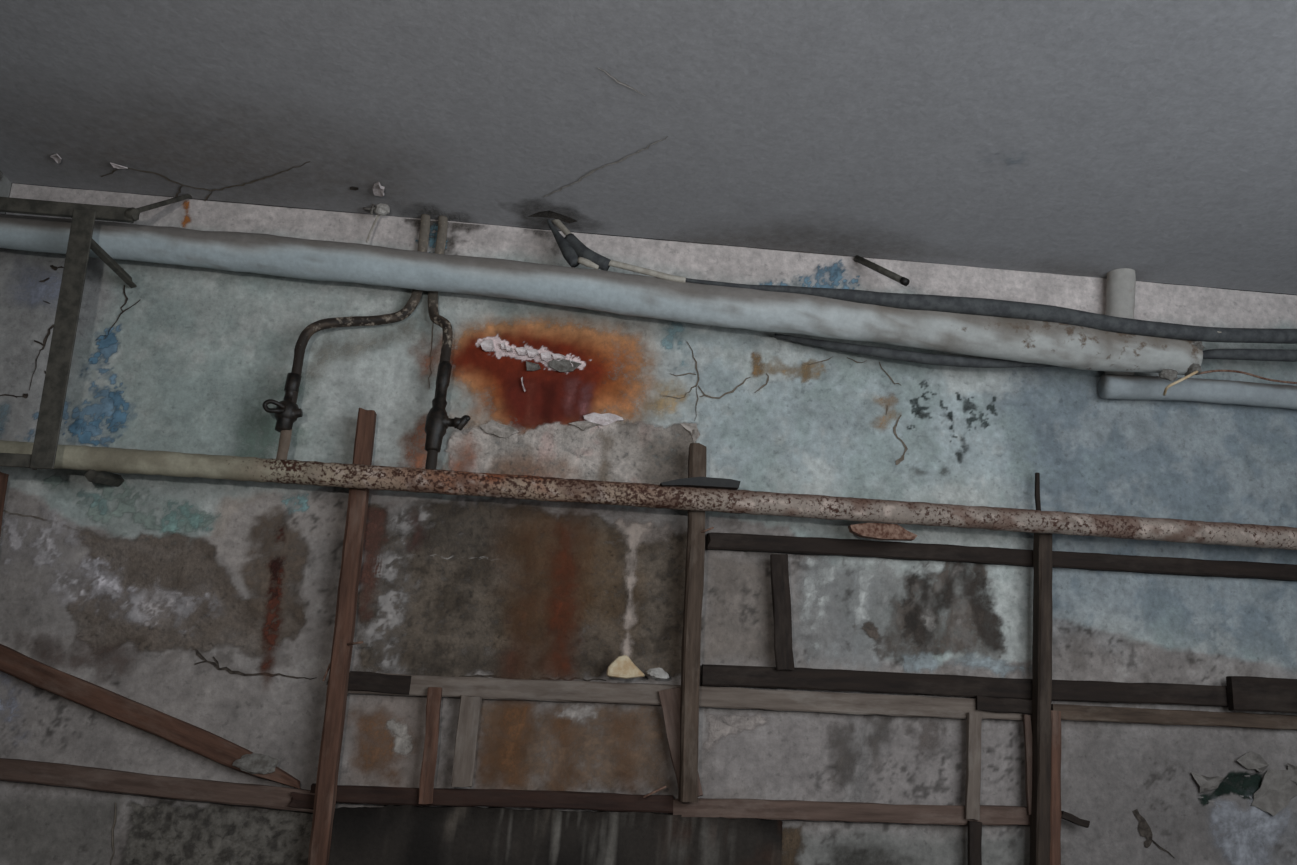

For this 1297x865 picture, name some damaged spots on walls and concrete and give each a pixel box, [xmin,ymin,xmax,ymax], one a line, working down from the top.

crack [0,265,64,398]
peeling [62,325,129,447]
corrosion [423,318,685,435]
crack [665,341,769,421]
corrosion [752,353,824,382]
peeling [760,260,860,290]
water stain [1,514,209,626]
crack [194,649,317,680]
corrosion [261,558,284,680]
water stain [364,506,429,672]
water stain [615,519,670,657]
water stain [834,560,1021,675]